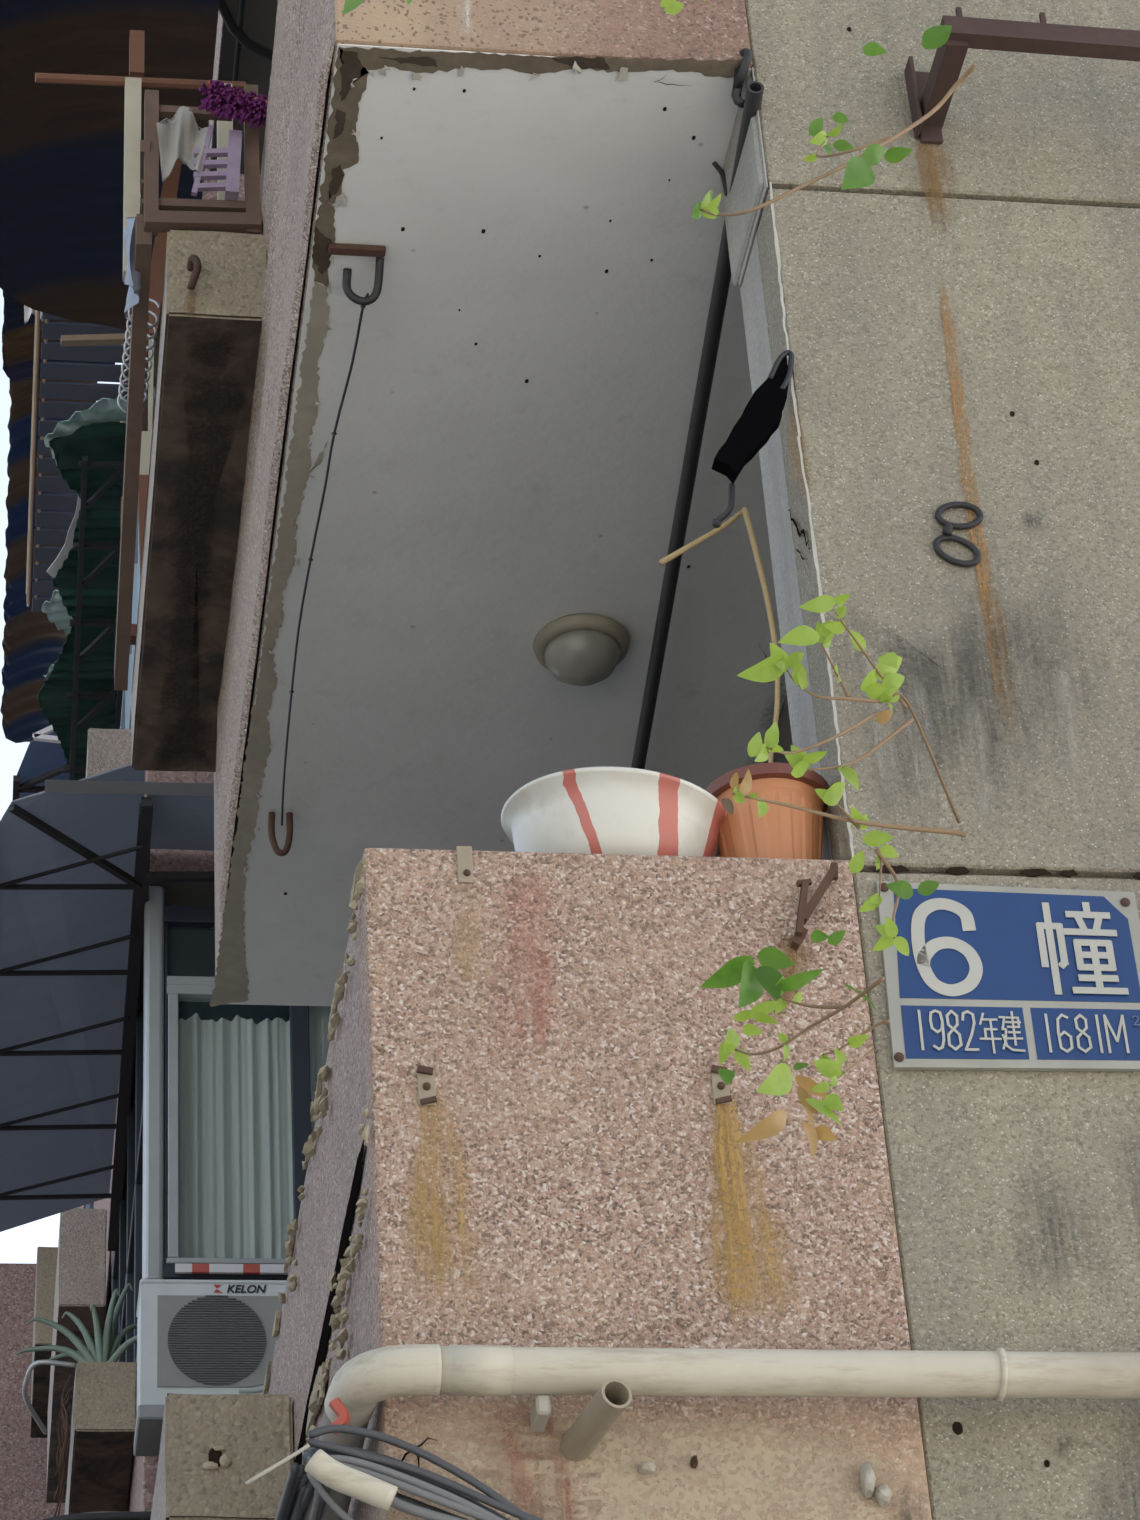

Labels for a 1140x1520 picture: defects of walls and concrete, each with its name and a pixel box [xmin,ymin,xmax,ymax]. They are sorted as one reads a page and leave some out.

damp [161,337,243,766]
peeling [210,47,742,1007]
corrosion [942,303,1005,698]
spalling [327,859,368,1042]
spalling [263,1361,271,1394]
spalling [272,1219,298,1337]
spalling [297,1065,330,1201]
crack [295,1140,365,1465]
spalling [302,1188,369,1467]
corrosion [714,1101,791,1303]